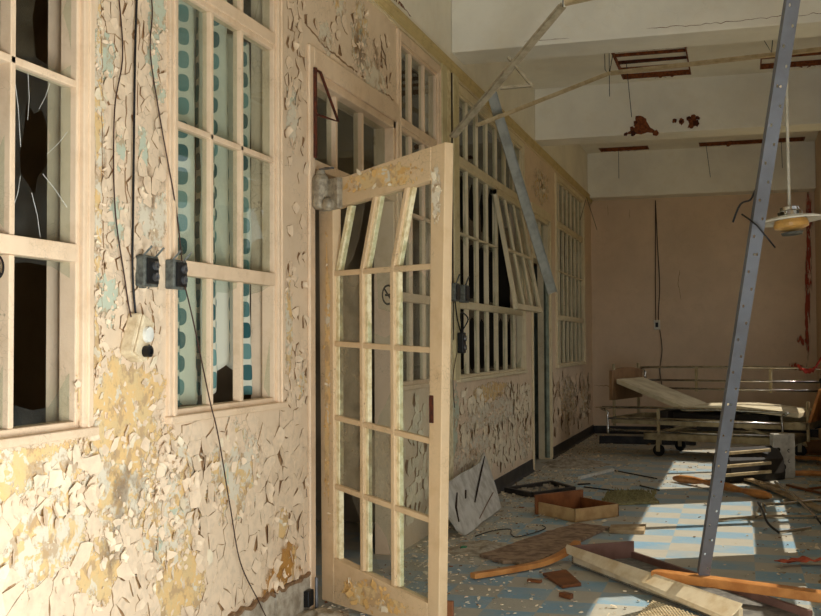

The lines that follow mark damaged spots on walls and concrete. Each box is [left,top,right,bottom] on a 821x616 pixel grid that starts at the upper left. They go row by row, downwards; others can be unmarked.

peeling [350,0,388,95]
corrosion [611,47,691,80]
peeling [0,0,268,616]
peeling [285,259,308,407]
corrosion [805,193,813,353]
peeling [453,385,493,473]
flaking render [228,507,311,616]